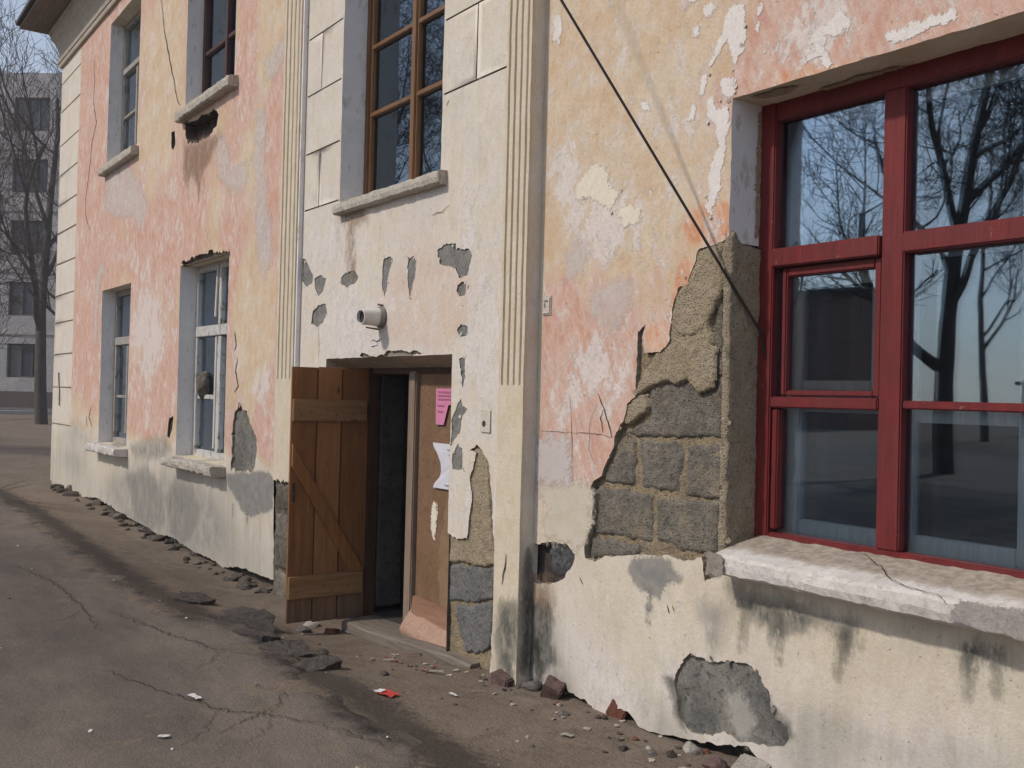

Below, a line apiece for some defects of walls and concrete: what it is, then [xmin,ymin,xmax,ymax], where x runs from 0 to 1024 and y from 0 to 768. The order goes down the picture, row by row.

crack [161,0,180,105]
peeling [884,7,958,44]
peeling [685,0,763,219]
peeling [171,109,271,271]
peeling [302,259,327,327]
peeling [437,243,472,296]
spalling [533,112,762,584]
spalling [231,405,257,472]
spalling [446,356,495,670]
leakage [629,556,679,611]
crack [850,553,946,604]
spalling [674,653,789,749]